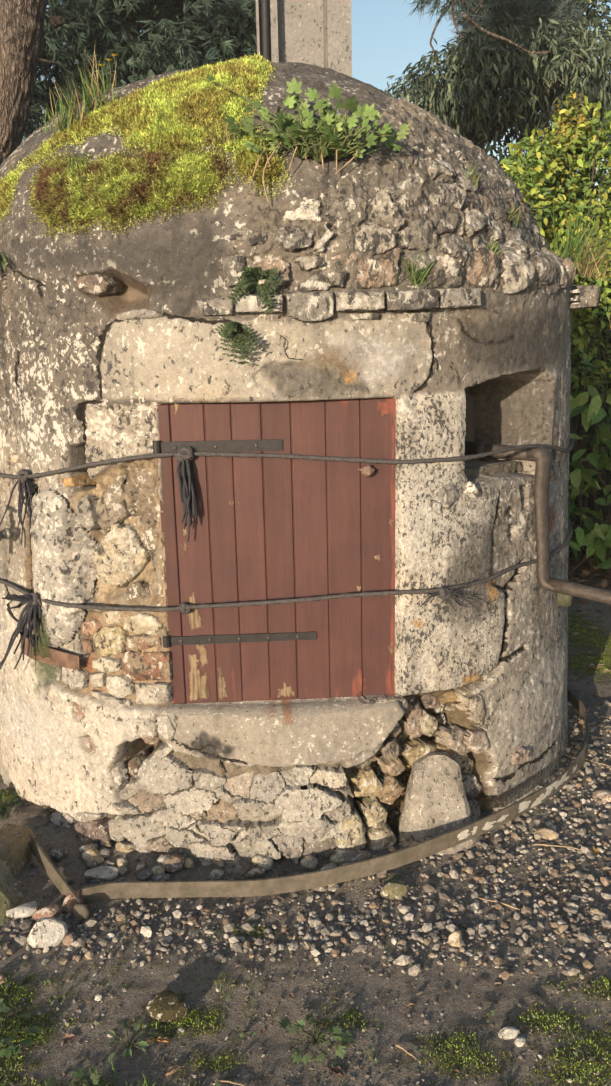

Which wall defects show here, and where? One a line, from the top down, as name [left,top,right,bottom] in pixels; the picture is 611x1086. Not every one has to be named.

crack [75,319,122,441]
crack [163,312,232,325]
crack [415,322,439,392]
crack [460,321,515,346]
crack [492,497,500,547]
crack [491,569,524,662]
spalling [40,453,577,866]